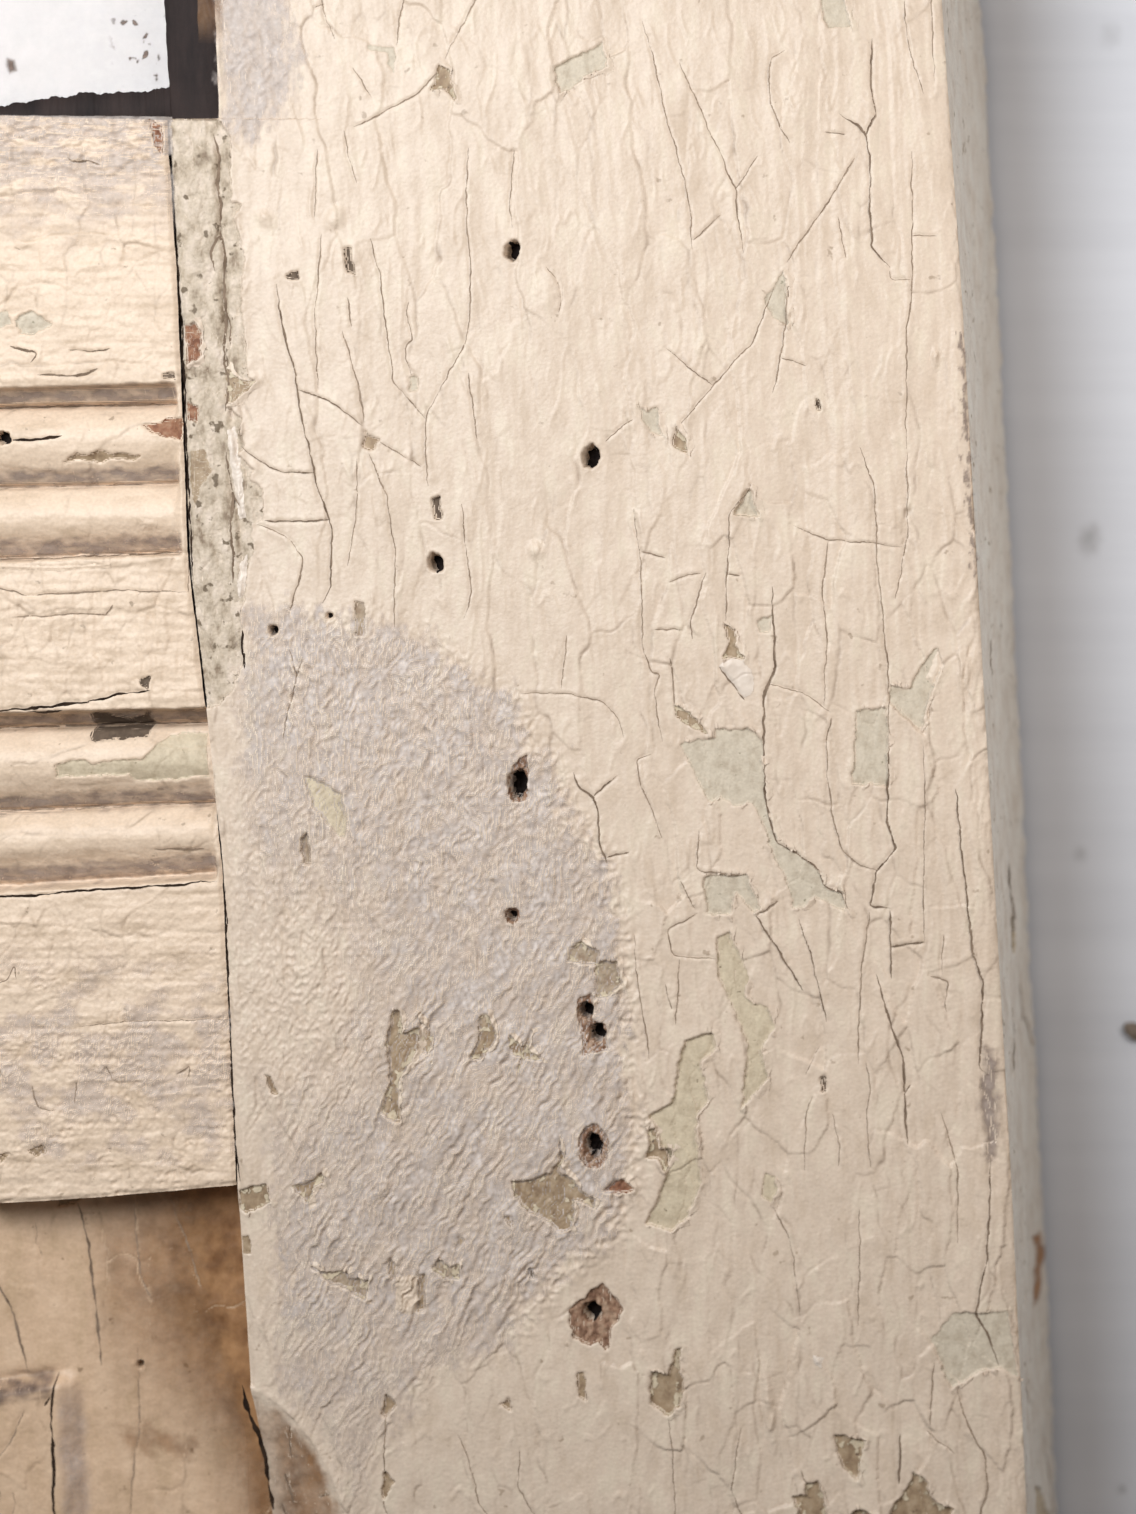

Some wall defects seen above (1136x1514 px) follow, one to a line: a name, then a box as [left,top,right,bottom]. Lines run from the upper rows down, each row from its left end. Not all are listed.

crack [0,134,232,617]
peeling [143,118,264,708]
crack [226,0,477,735]
crack [0,690,201,729]
peeling [54,710,209,781]
peeling [674,703,856,919]
crack [523,0,1053,1514]
peeling [503,1138,641,1235]
crack [0,1287,59,1514]
crack [242,1385,329,1514]
peeling [650,1347,691,1421]
peeling [834,1433,960,1514]